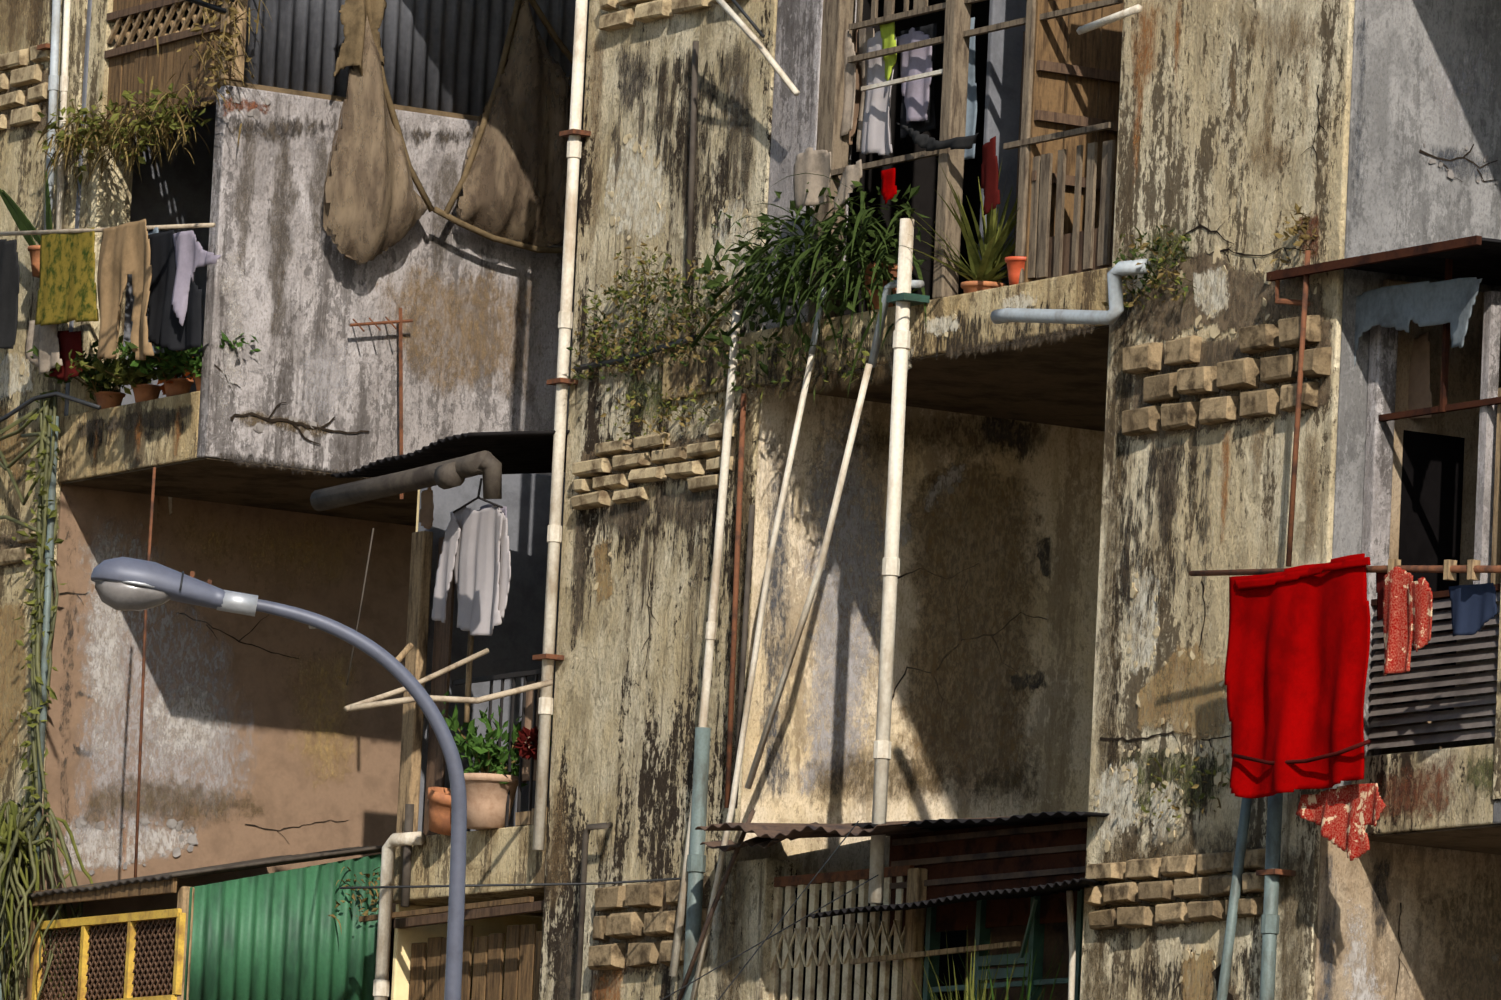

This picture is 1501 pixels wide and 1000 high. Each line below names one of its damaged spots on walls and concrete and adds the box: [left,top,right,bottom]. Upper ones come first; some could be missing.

damp [590,38,754,272]
crack [1419,144,1498,182]
spalling [1133,246,1325,343]
damp [76,406,193,461]
crack [214,364,370,445]
peeling [592,540,614,606]
damp [570,280,1225,832]
crack [892,563,1047,723]
peeling [1090,560,1230,852]
damp [1372,858,1390,936]
damp [1419,875,1501,1000]